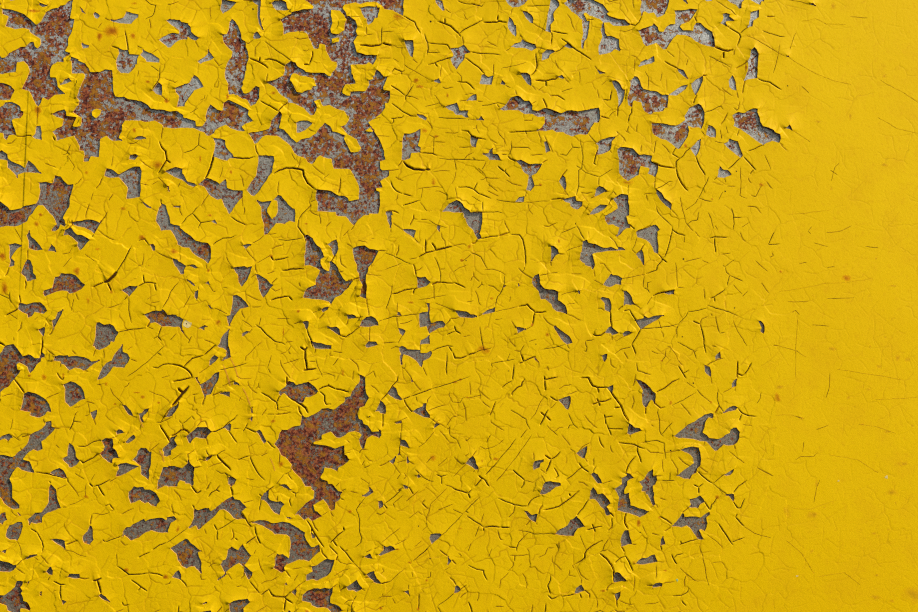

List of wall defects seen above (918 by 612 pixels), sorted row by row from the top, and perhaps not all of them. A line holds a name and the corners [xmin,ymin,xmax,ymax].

crack [693,0,863,143]
crack [45,137,113,240]
peeling [0,0,404,299]
peeling [470,0,764,314]
peeling [0,273,129,407]
peeling [297,234,380,349]
crack [756,233,867,357]
peeling [0,387,80,540]
crack [11,510,101,598]
crack [37,401,132,523]
peeling [95,420,231,506]
peeling [188,374,398,612]